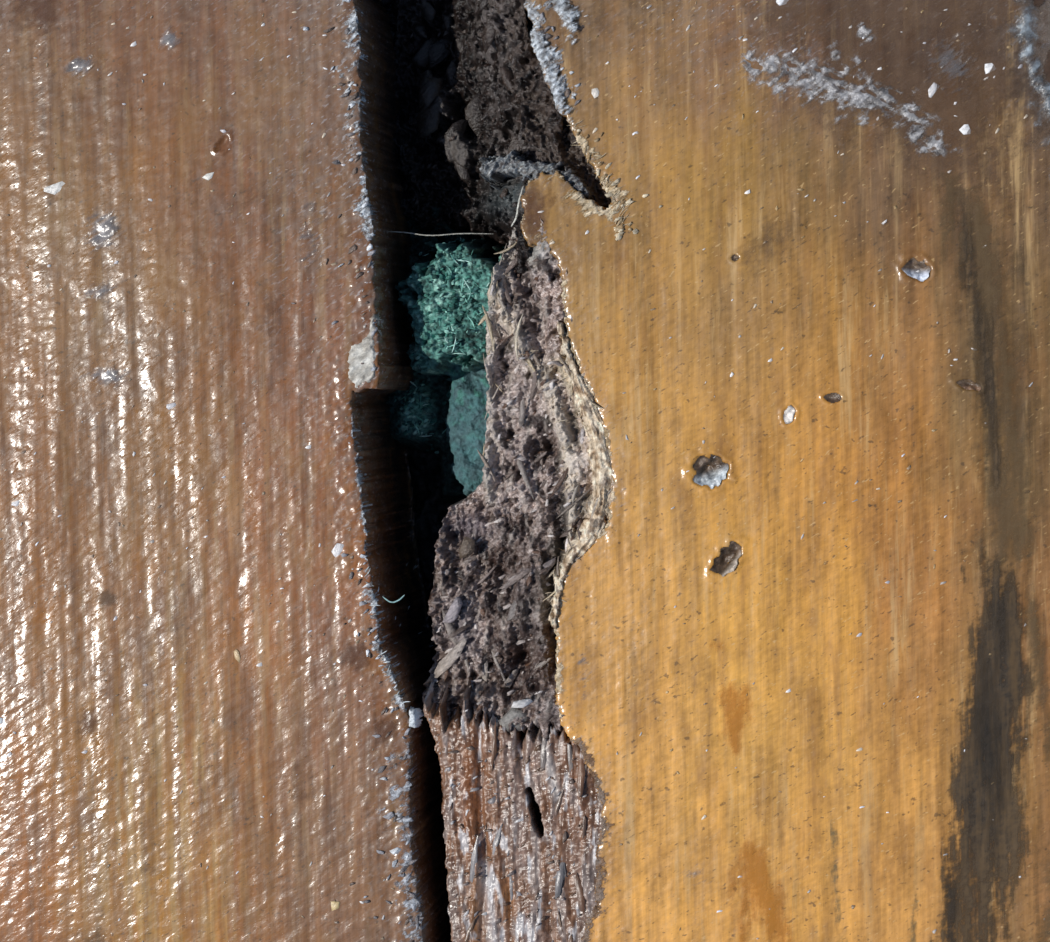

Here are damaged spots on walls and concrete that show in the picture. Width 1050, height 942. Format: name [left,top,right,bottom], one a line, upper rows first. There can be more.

peeling [323,0,377,279]
crack [524,9,533,39]
crack [520,99,612,208]
crack [406,449,455,632]
spalling [341,218,615,942]
damp [930,180,1047,942]